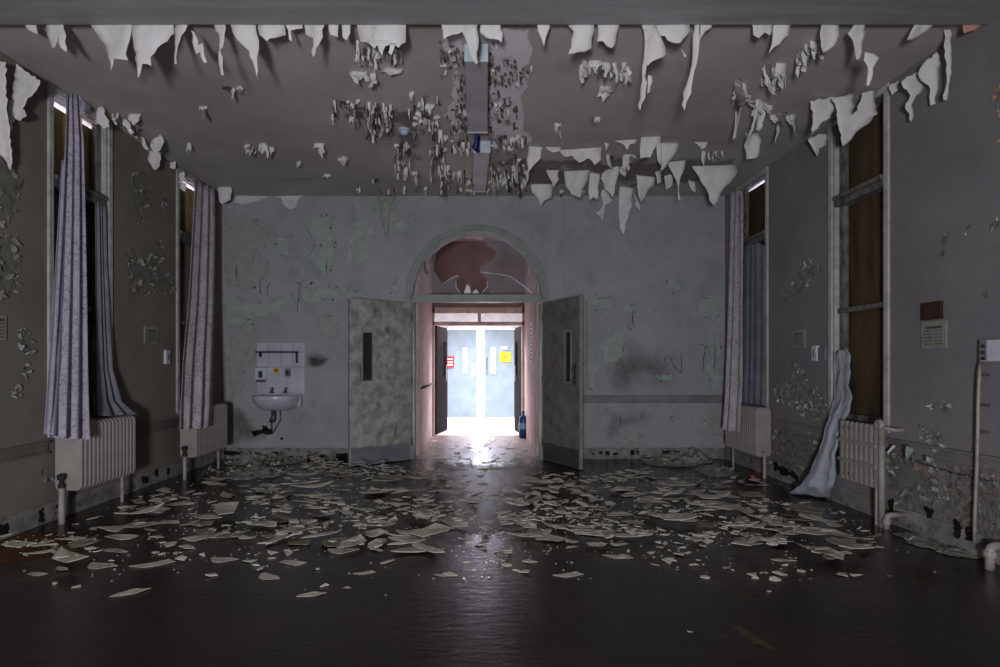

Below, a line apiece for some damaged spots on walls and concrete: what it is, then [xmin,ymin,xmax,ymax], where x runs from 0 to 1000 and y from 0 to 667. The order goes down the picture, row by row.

peeling [0,61,40,300]
peeling [25,25,67,52]
peeling [91,25,406,100]
peeling [331,25,737,238]
peeling [732,25,879,159]
peeling [889,25,981,122]
peeling [217,187,363,328]
peeling [11,328,36,398]
peeling [885,424,1000,540]